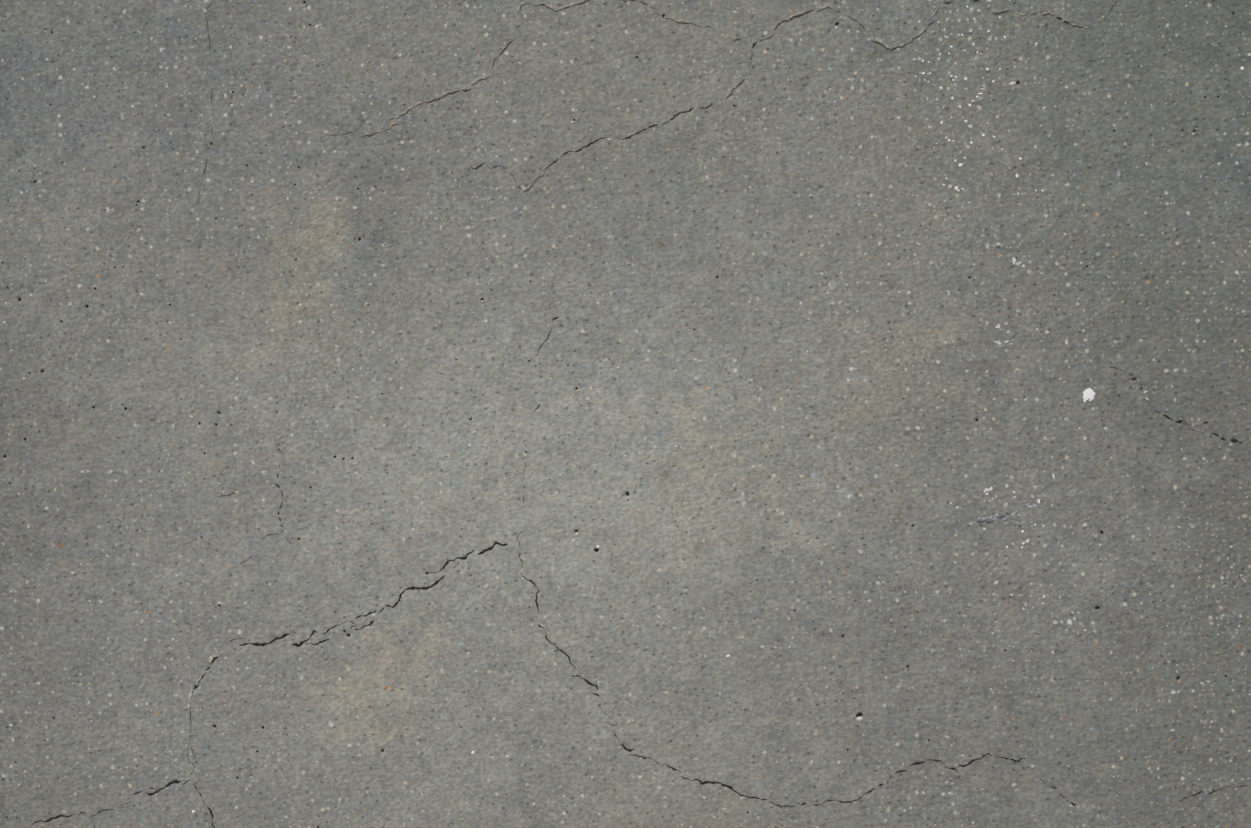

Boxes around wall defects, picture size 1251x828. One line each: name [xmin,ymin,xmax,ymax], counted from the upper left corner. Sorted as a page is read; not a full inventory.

crack [327,0,1116,199]
crack [1108,366,1251,452]
crack [237,411,291,565]
crack [33,534,1076,828]
crack [1176,785,1249,813]